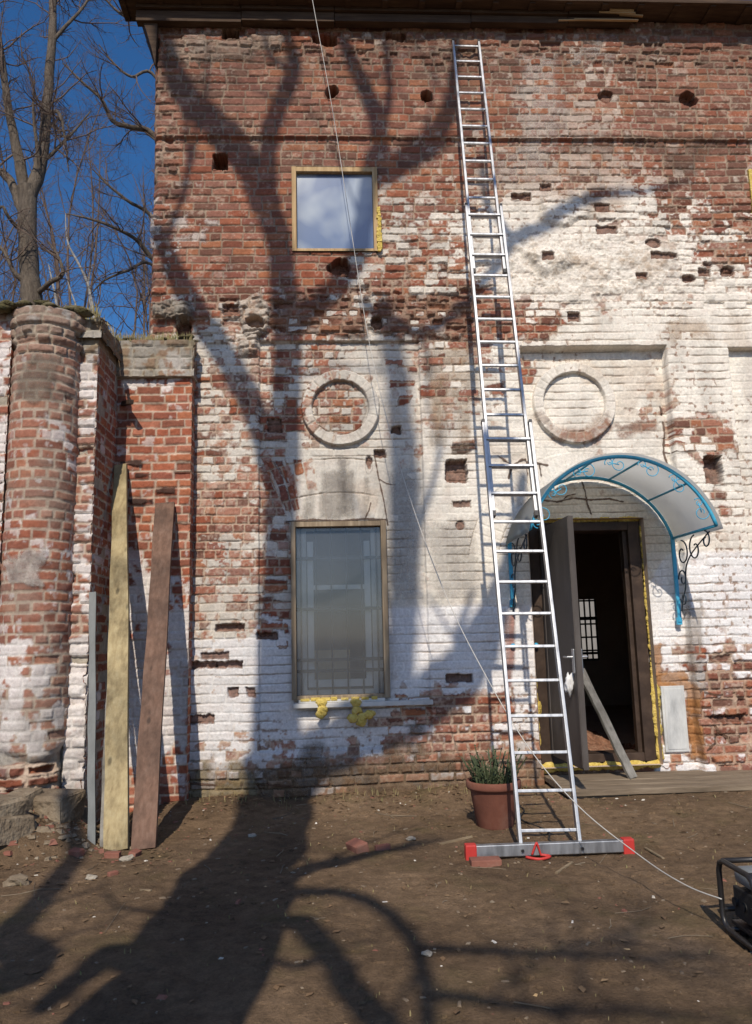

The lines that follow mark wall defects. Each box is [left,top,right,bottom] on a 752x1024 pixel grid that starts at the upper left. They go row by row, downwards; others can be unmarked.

spalling [511,186,549,201]
spalling [595,204,618,234]
spalling [646,240,679,259]
spalling [681,260,732,283]
spalling [177,323,193,336]
peeling [193,446,225,466]
peeling [535,412,739,517]
crack [499,456,624,514]
peeling [3,548,46,586]
peeling [214,460,304,649]
spalling [187,714,215,725]
peeling [682,644,752,770]